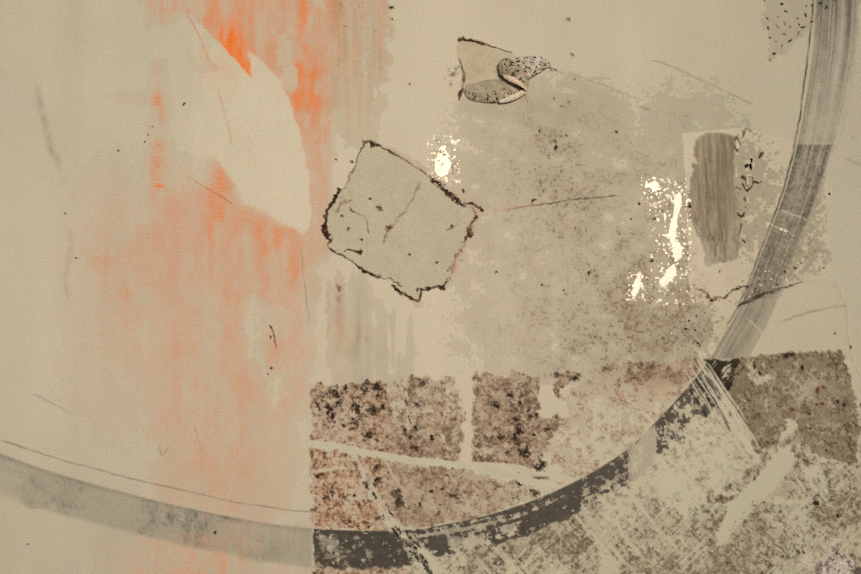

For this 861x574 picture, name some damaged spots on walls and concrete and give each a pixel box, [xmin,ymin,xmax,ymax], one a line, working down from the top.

rust [325,0,395,151]
peeling [443,35,595,132]
peeling [320,139,485,308]
rust [325,269,348,384]